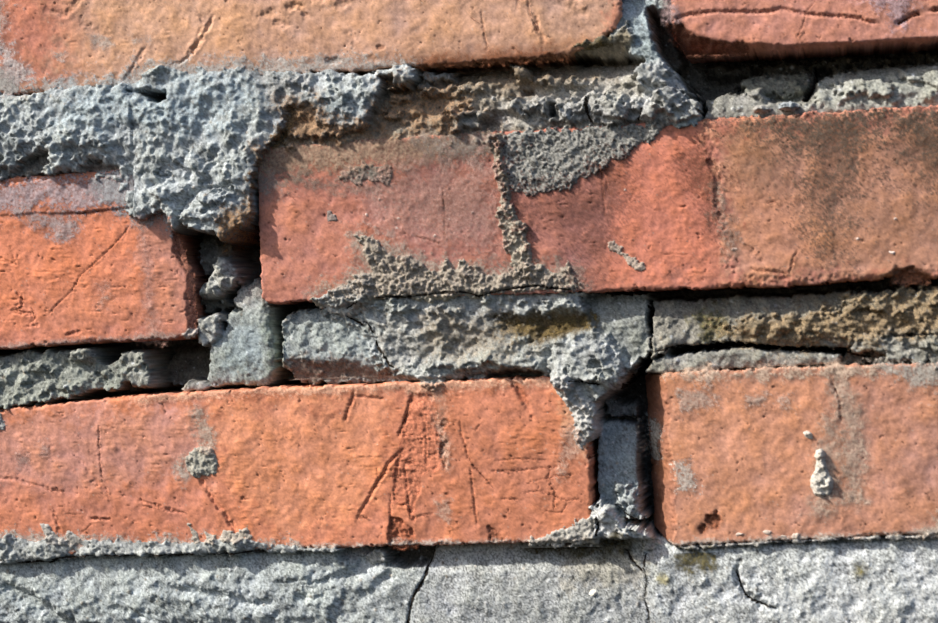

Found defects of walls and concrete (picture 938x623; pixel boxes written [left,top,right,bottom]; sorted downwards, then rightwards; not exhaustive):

crack [671,9,779,22]
crack [897,9,938,25]
crack [583,96,593,123]
crack [407,549,435,623]
crack [736,572,776,608]